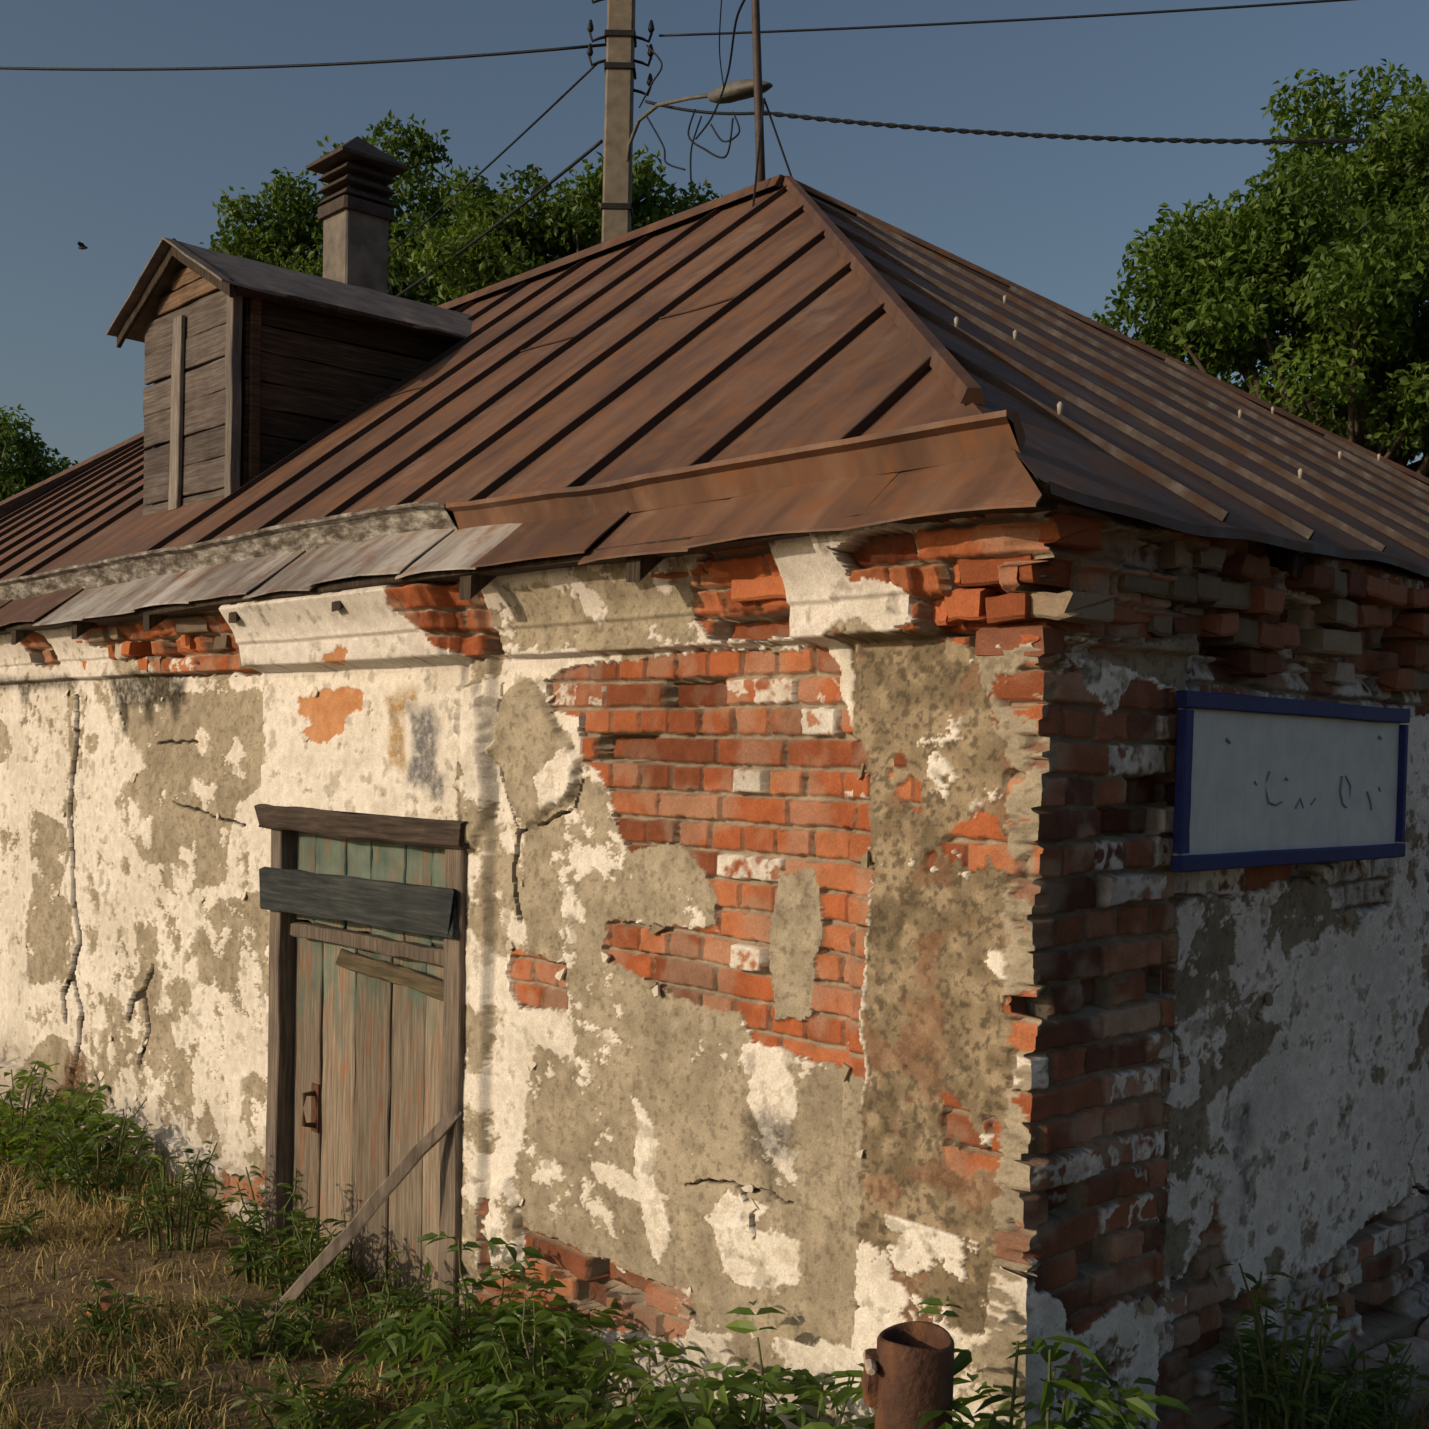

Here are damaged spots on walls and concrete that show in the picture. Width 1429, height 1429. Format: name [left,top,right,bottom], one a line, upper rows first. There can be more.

crack [59,694,85,1085]
crack [125,963,154,1069]
peeling [10,604,270,1207]
peeling [297,685,364,743]
peeling [320,644,348,665]
peeling [473,545,875,1349]
crack [685,1177,791,1233]
spalling [827,476,1429,1429]